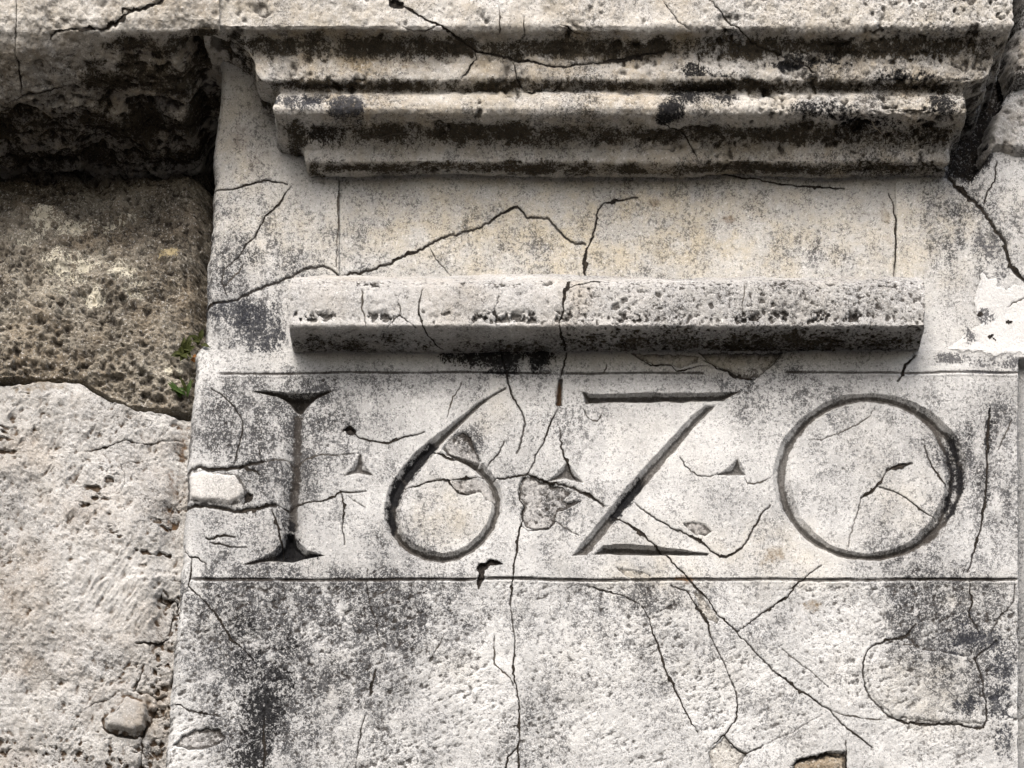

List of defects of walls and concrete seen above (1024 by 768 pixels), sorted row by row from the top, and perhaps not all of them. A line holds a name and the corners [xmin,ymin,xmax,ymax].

leakage [274,93,365,145]
leakage [655,91,739,126]
leakage [681,62,742,77]
leakage [764,52,853,73]
leakage [783,68,958,128]
crack [949,164,1024,307]
crack [206,180,626,378]
peeling [947,272,1024,356]
crack [189,393,421,473]
spalling [520,477,576,531]
crack [136,491,362,647]
crack [408,358,1015,768]